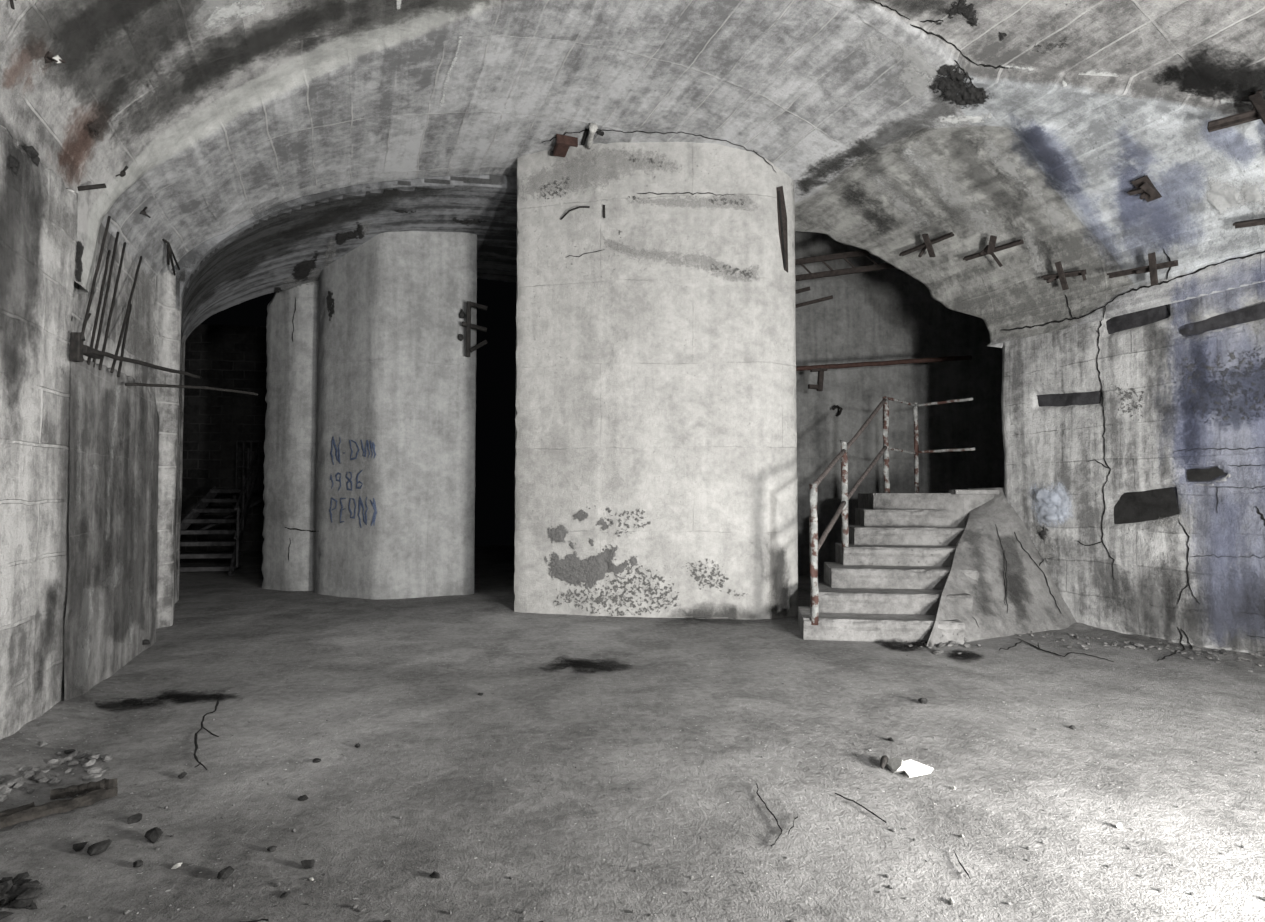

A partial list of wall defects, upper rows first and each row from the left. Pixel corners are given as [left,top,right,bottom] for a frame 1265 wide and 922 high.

damp [197,0,264,28]
crack [871,0,1028,99]
spalling [930,65,988,109]
damp [1165,53,1265,106]
crack [1002,250,1265,578]
peeling [545,507,679,616]
peeling [682,558,745,599]
crack [995,524,1114,662]
crack [1157,520,1265,661]